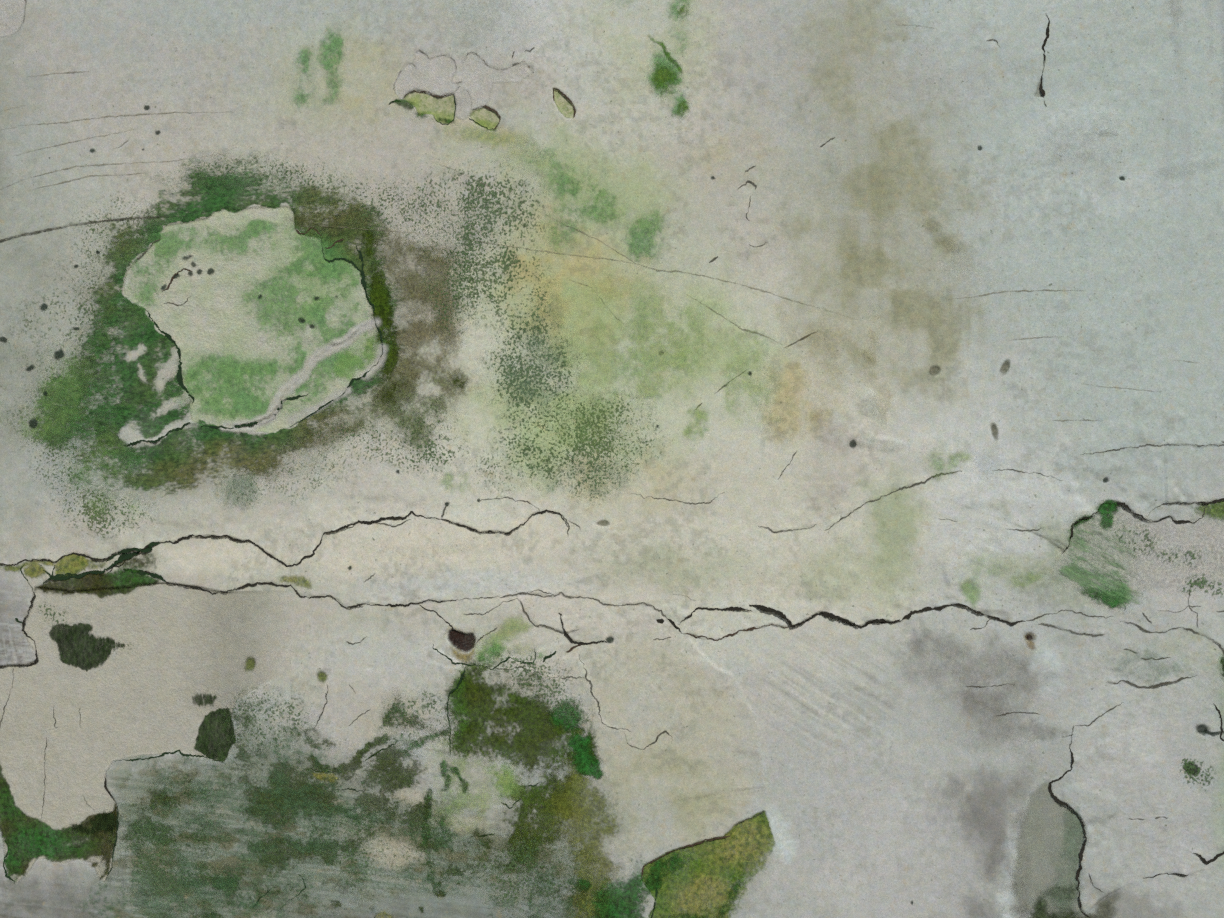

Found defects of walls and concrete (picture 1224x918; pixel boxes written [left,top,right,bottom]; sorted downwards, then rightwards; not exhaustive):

peeling [389,47,535,130]
crack [1036,16,1050,107]
peeling [124,206,386,446]
leakage [20,159,659,535]
crack [631,492,724,505]
crack [760,471,958,533]
spalling [1062,500,1224,608]
crack [1081,441,1224,455]
spalling [0,583,242,882]
leakage [125,653,646,918]
crack [0,496,1224,918]
spalling [641,811,774,918]